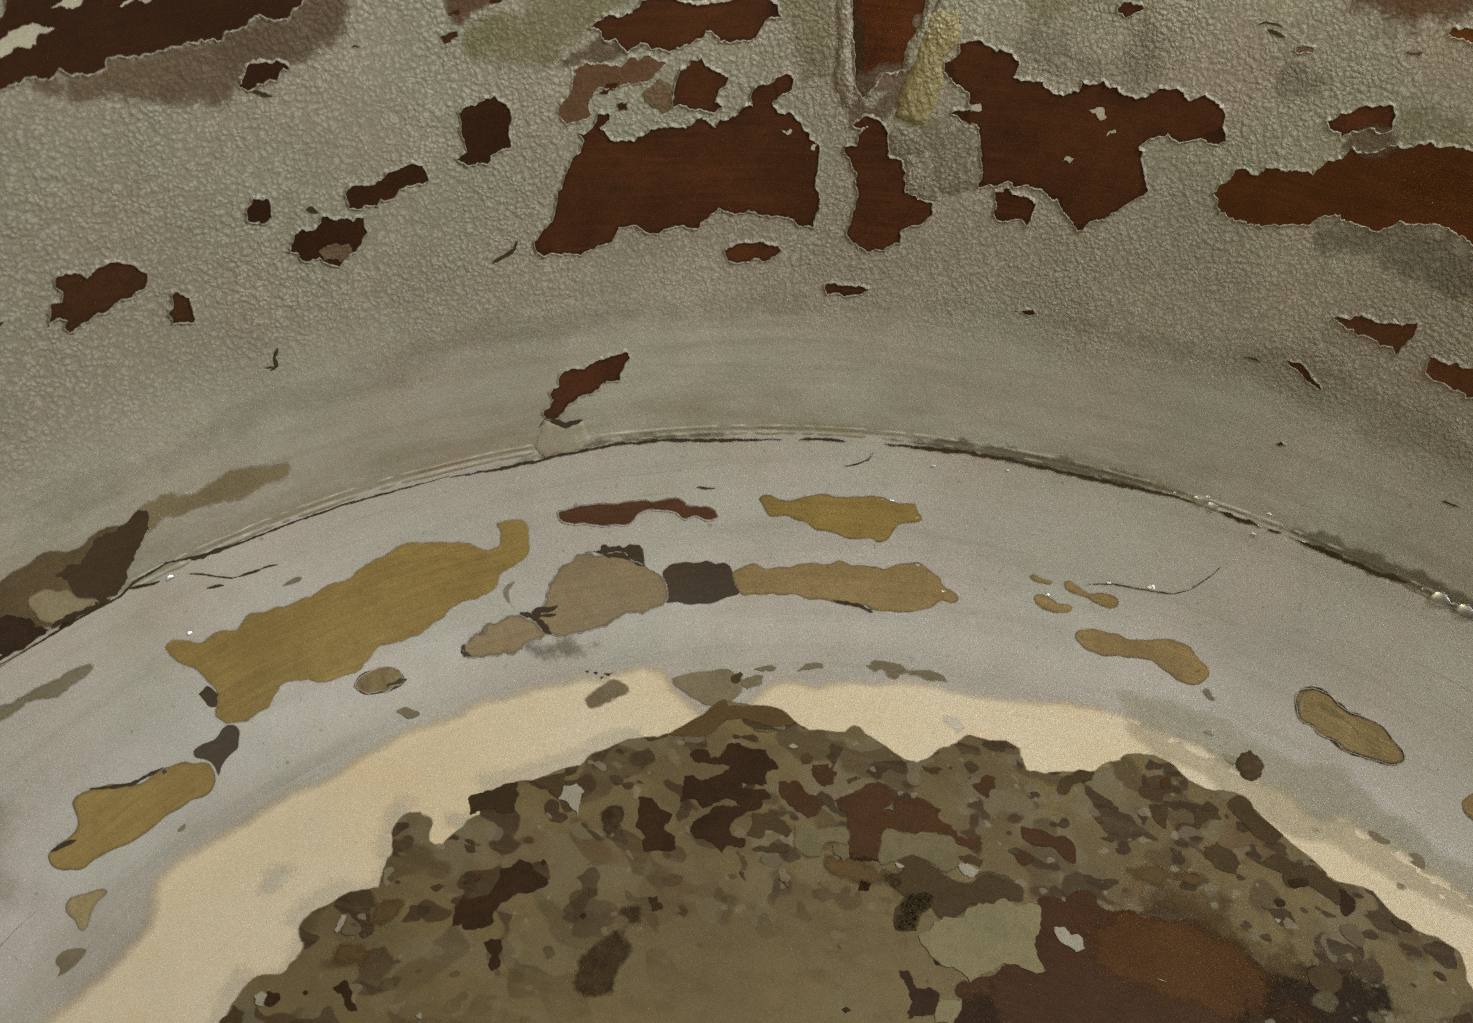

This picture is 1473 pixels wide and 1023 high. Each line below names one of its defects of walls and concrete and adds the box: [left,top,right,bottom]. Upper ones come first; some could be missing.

peeling [0,0,305,97]
peeling [531,0,822,260]
peeling [834,0,1228,255]
peeling [1210,100,1473,249]
peeling [45,257,149,335]
peeling [166,288,196,327]
peeling [721,239,784,266]
peeling [535,348,633,457]
peeling [461,494,959,659]
peeling [49,520,530,870]
peeling [866,659,950,683]
peeling [636,665,1406,1023]